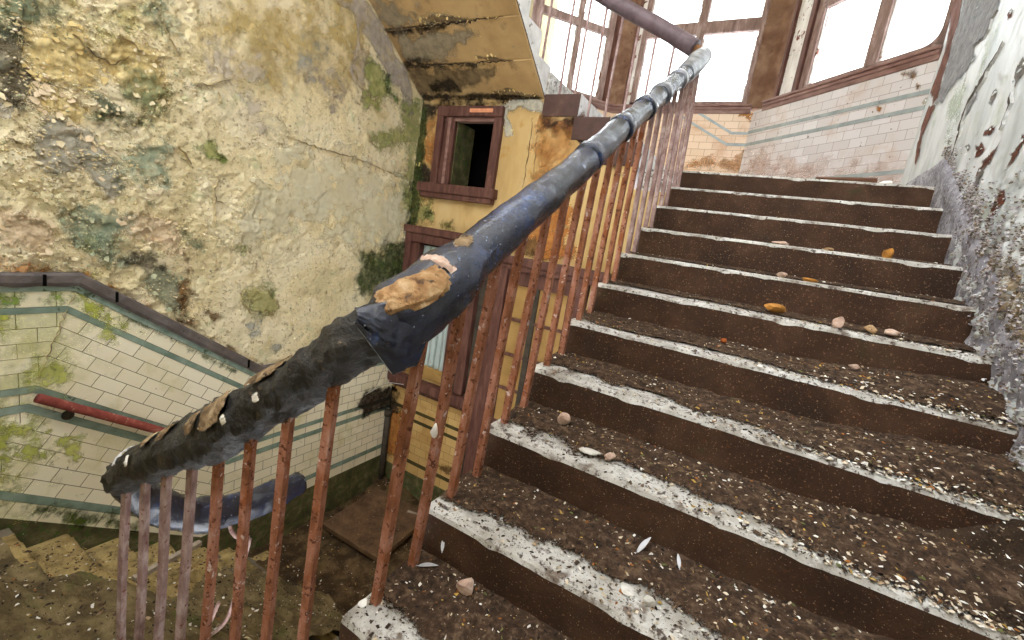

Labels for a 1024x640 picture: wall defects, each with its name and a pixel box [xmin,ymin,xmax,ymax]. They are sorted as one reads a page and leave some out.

damp [385,22,446,37]
damp [403,62,484,70]
flaking render [915,0,1012,164]
flaking render [1012,57,1024,87]
crack [286,133,407,177]
flaking render [965,124,1000,198]
flaking render [1004,135,1024,170]